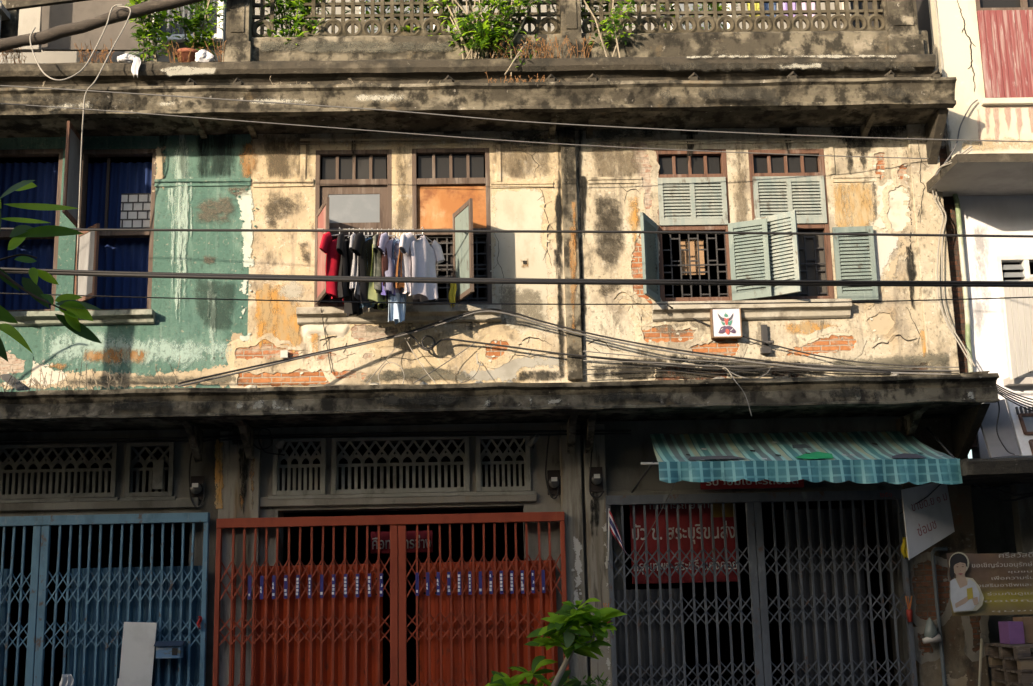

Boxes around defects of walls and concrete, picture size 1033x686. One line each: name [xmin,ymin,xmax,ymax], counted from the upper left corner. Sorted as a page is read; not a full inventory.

crack [935,0,976,92]
peeling [152,146,166,192]
water stain [830,126,906,175]
spalling [0,323,406,391]
peeling [233,185,257,318]
peeling [476,188,550,369]
water stain [500,288,542,327]
water stain [518,127,624,381]
water stain [594,353,949,403]
spalling [764,146,915,378]
crack [787,307,920,348]
water stain [906,245,916,309]